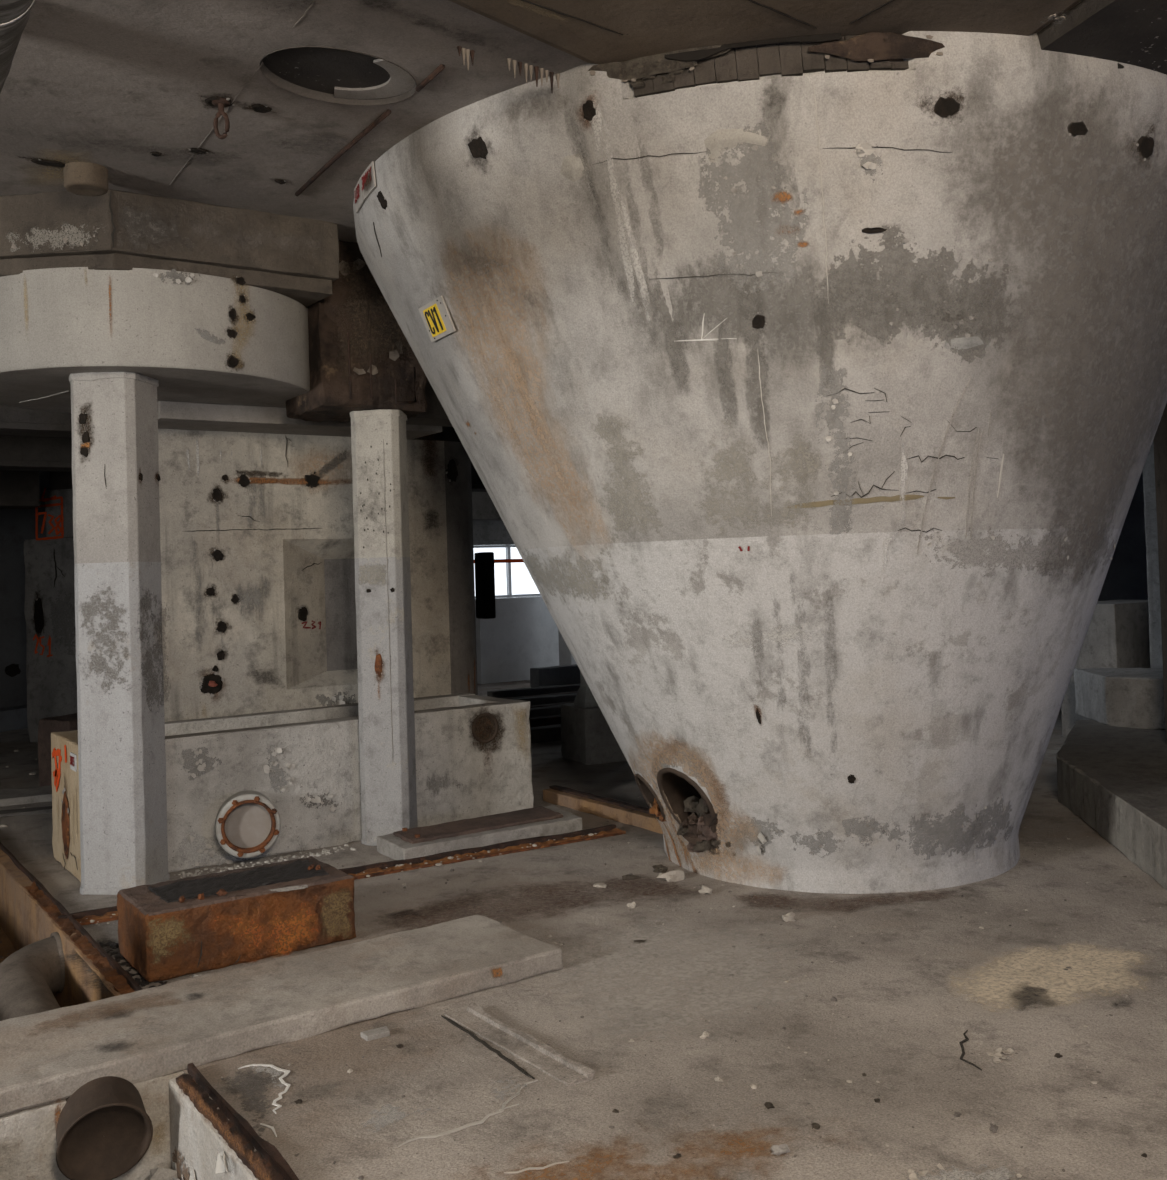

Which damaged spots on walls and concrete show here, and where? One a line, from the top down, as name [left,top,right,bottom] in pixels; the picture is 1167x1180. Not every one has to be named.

spalling [588,44,733,90]
spalling [808,32,945,62]
flaking render [195,276,256,344]
spalling [226,355,244,370]
leakage [591,105,1002,555]
corrosion [236,451,350,485]
crack [787,388,998,533]
corrosion [633,740,754,872]
corrosion [25,881,176,1029]
corrosion [211,889,352,962]
crack [959,1030,982,1071]
peeling [238,1064,290,1137]